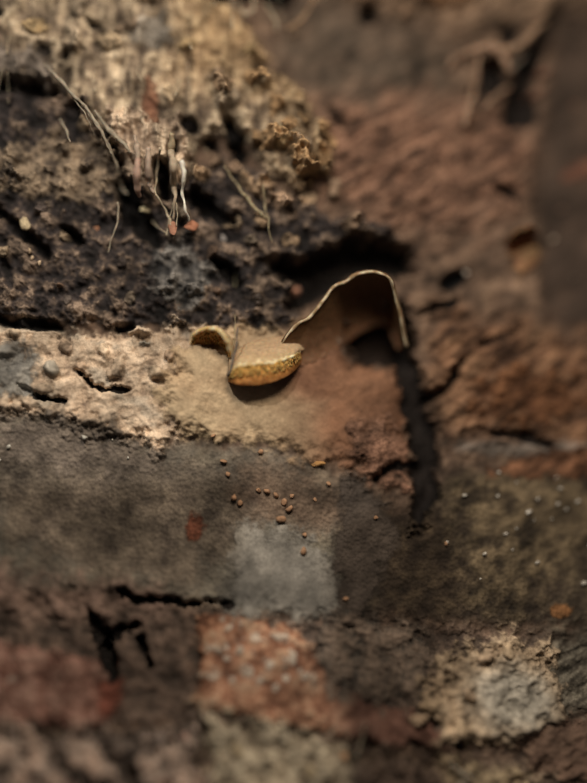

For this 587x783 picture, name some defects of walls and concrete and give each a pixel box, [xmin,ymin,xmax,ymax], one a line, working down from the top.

spalling [0,0,411,452]
crack [374,298,522,537]